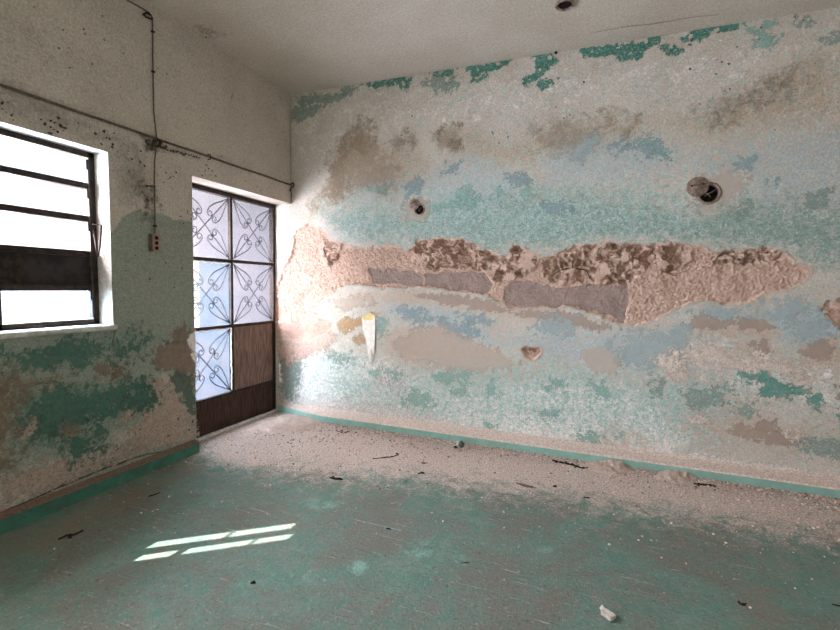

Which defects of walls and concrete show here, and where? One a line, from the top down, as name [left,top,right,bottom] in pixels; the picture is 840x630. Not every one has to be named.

spalling [275,222,814,411]
spalling [820,298,840,329]
peeling [0,320,200,479]